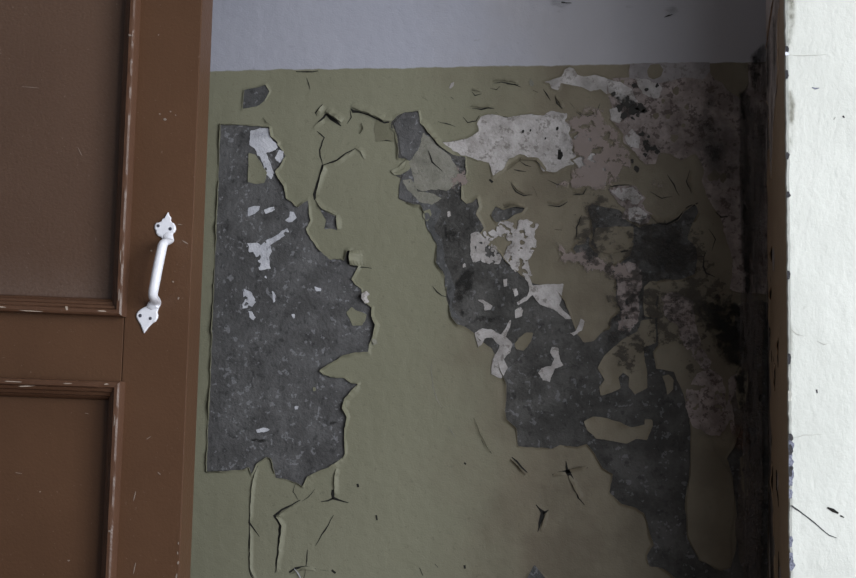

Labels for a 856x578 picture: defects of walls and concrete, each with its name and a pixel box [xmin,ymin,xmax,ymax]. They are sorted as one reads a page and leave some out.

peeling [240,82,272,112]
leakage [611,62,710,120]
crack [313,100,398,200]
leakage [631,131,660,173]
peeling [204,118,380,490]
peeling [388,0,789,578]
leakage [699,46,776,578]
crack [471,418,527,476]
crack [552,462,588,504]
crack [248,466,349,578]
crack [536,505,551,532]